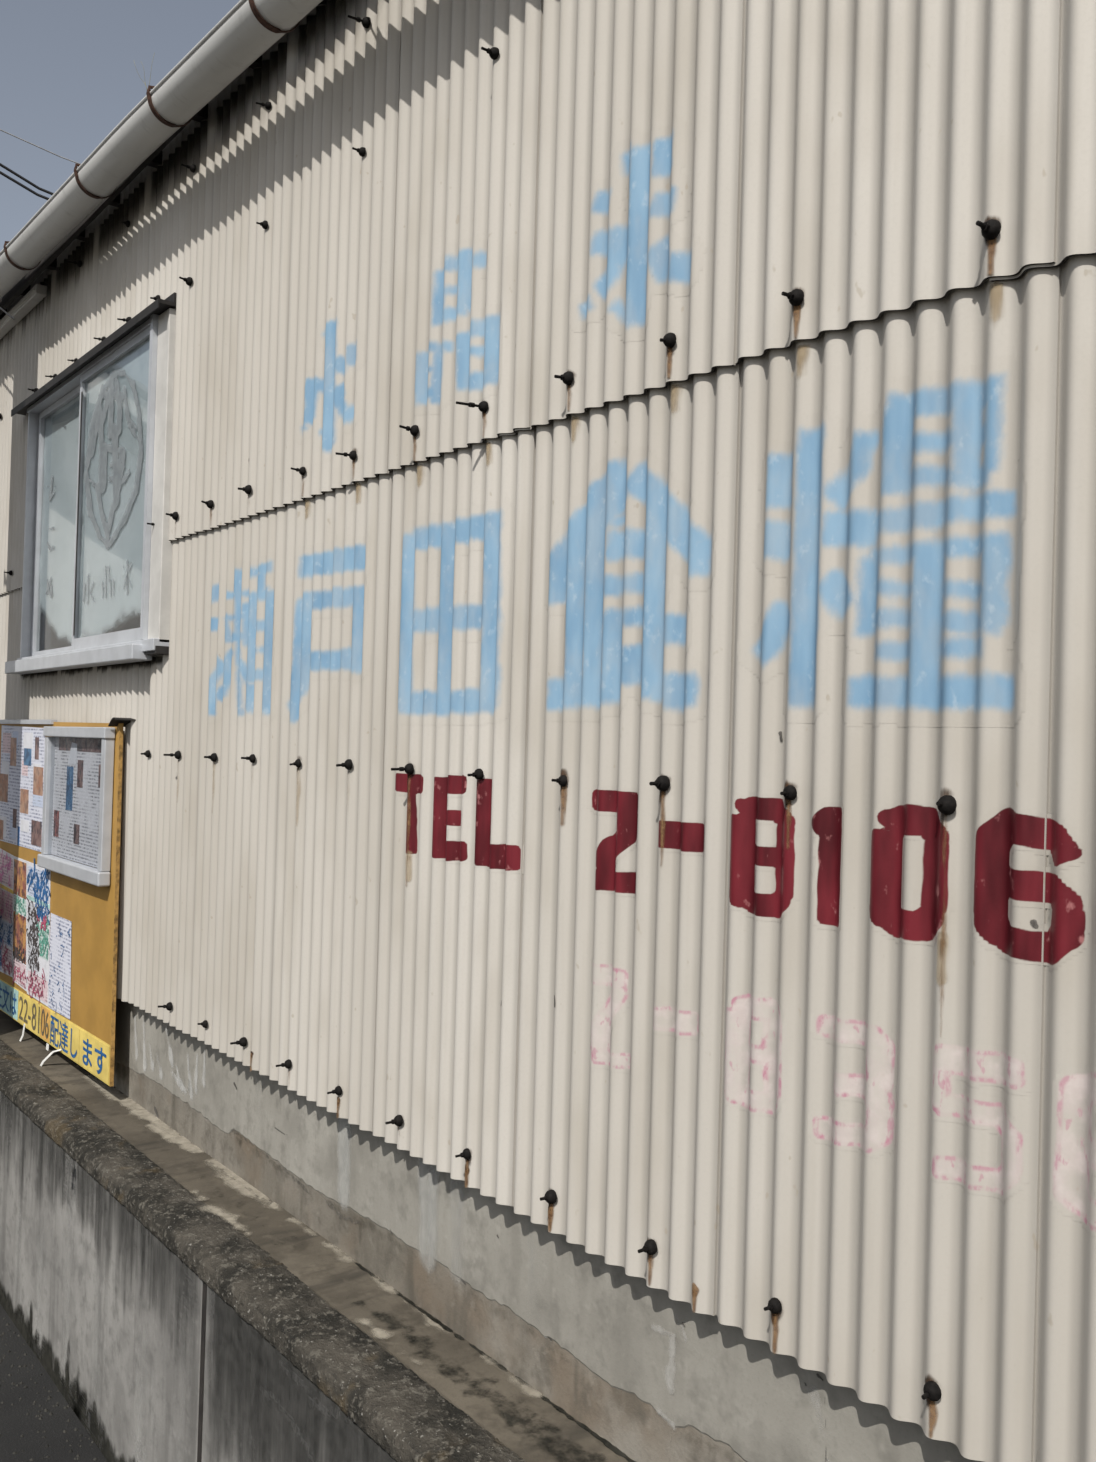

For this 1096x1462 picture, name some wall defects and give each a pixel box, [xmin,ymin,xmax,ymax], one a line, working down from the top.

rust [985,217,1000,278]
rust [792,288,801,339]
leakage [85,1075,298,1222]
leakage [0,1092,188,1307]
rust [771,1312,781,1353]
leakage [65,1345,82,1416]
rust [925,1376,937,1437]